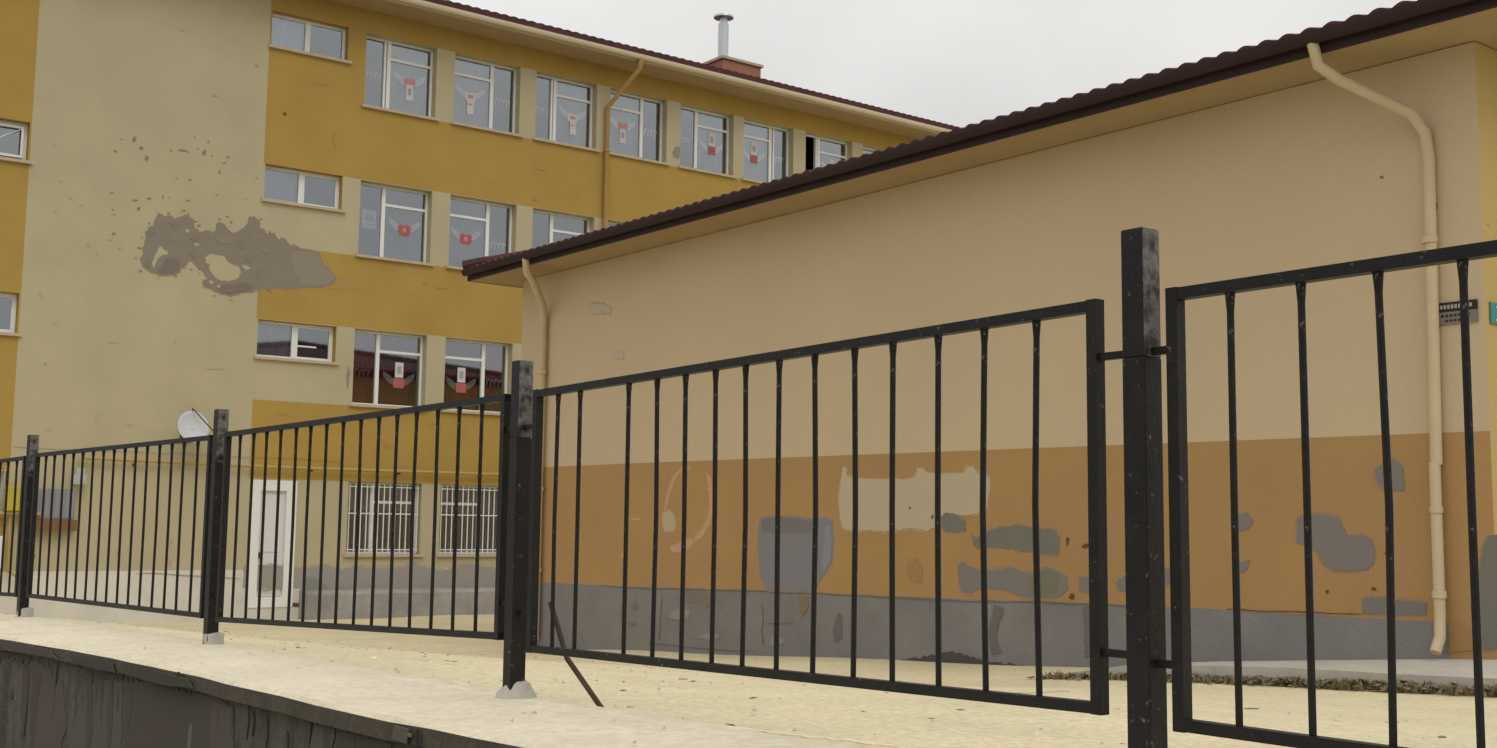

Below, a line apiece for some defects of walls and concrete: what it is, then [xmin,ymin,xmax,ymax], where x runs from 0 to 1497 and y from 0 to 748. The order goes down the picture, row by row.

flaking render [86,192,355,297]